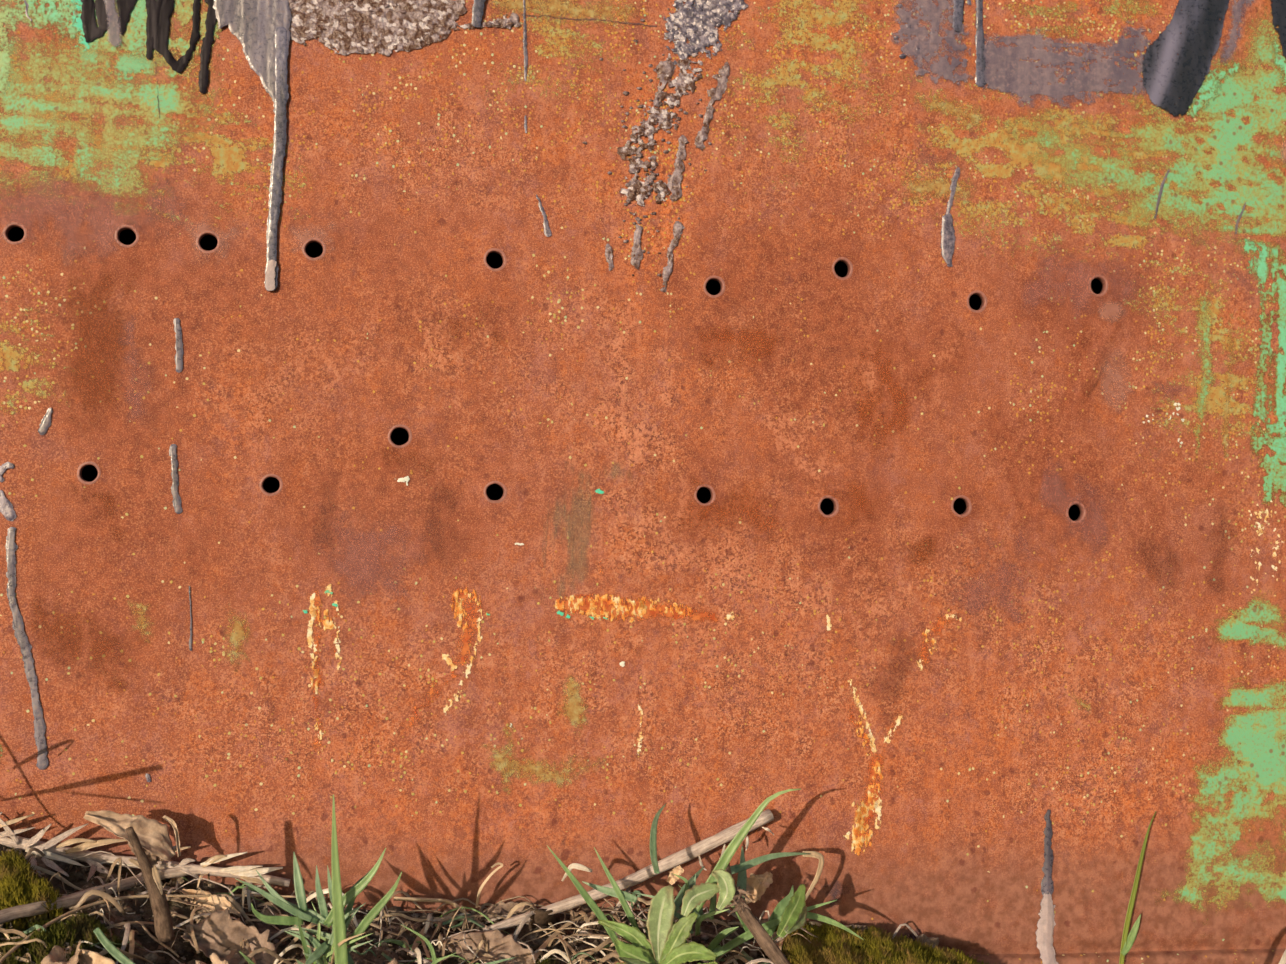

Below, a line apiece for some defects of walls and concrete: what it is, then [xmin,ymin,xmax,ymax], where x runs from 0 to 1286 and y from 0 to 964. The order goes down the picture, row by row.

peeling [0,0,220,212]
peeling [903,172,973,206]
peeling [1007,0,1286,650]
peeling [1162,678,1286,910]